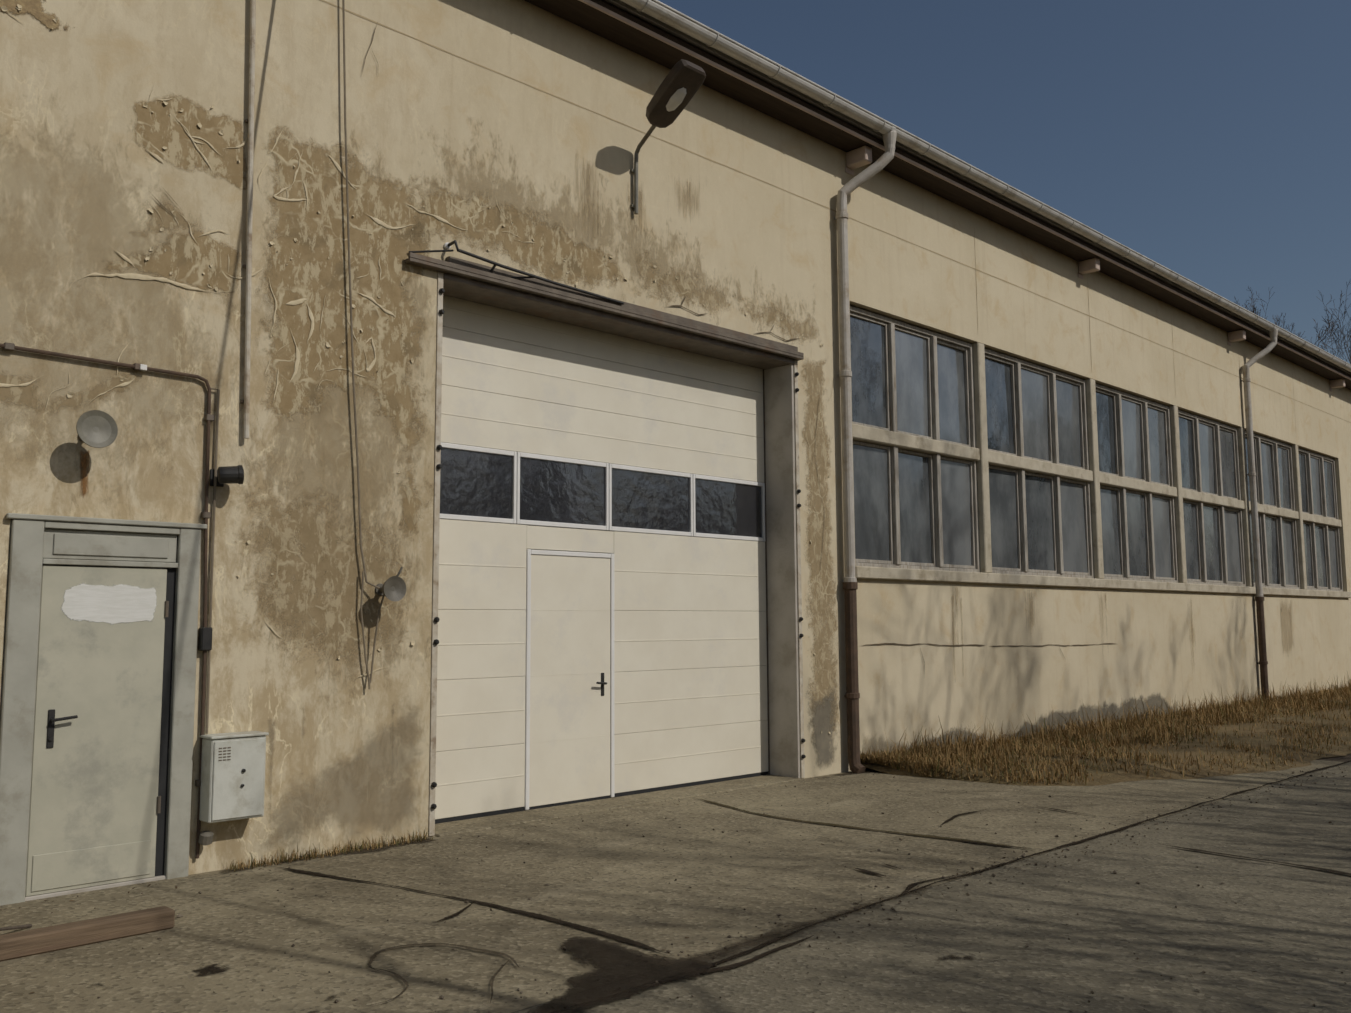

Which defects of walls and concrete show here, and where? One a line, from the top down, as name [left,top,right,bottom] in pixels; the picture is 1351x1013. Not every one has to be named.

peeling [0,0,75,31]
peeling [67,90,839,734]
damp [812,696,834,766]
crack [274,866,669,954]
crack [490,959,510,1002]